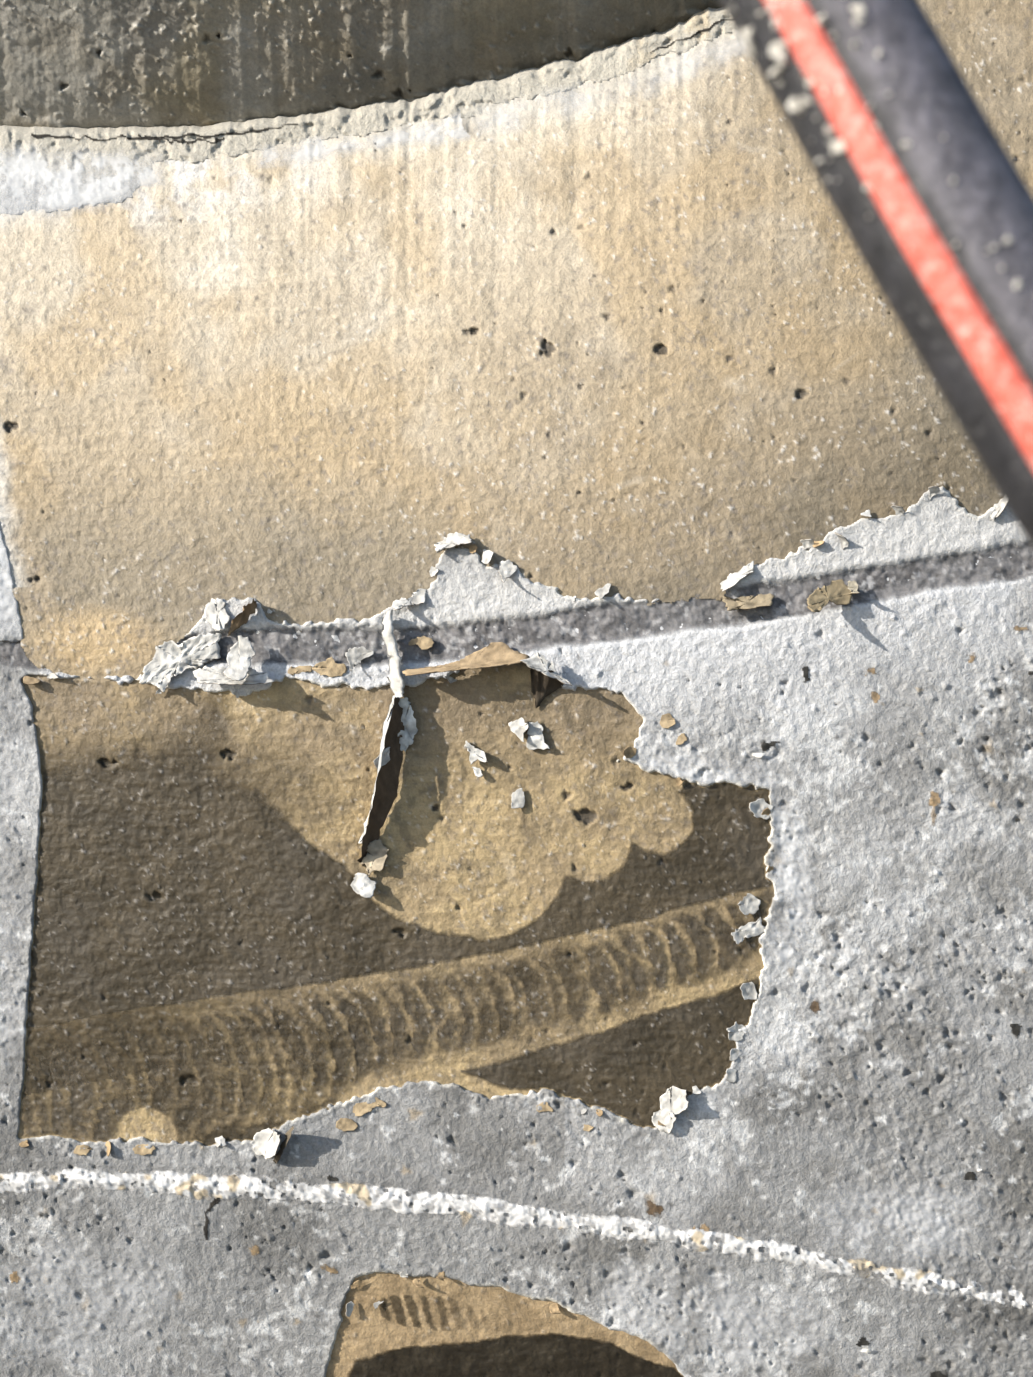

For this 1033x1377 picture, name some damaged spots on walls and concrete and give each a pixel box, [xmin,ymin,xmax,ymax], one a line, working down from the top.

crack [650,19,730,53]
peeling [919,0,1033,194]
peeling [0,29,1006,692]
spalling [752,740,780,758]
peeling [18,610,775,1164]
spalling [1010,1024,1022,1038]
peeling [326,1271,684,1377]